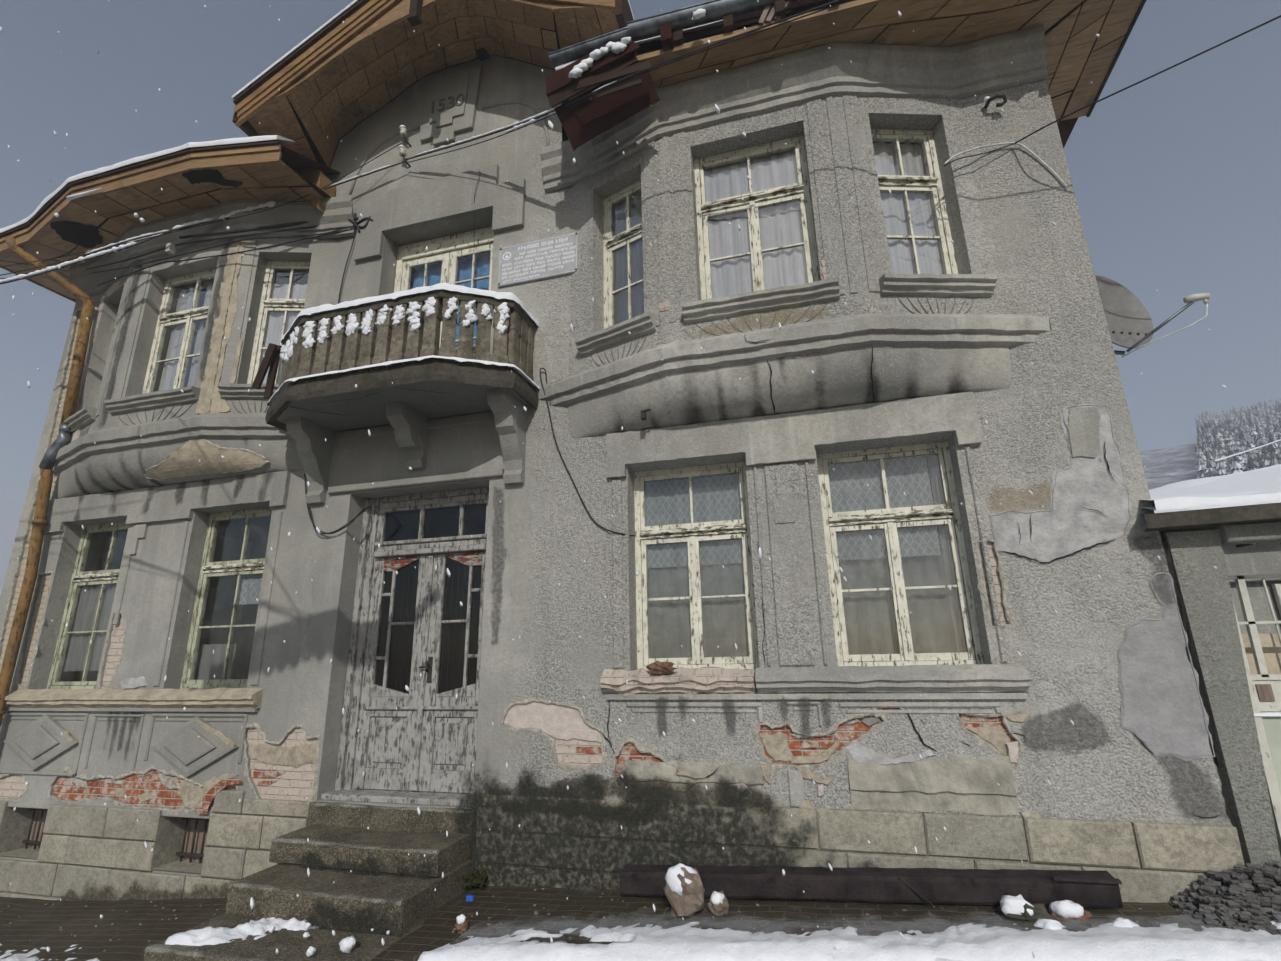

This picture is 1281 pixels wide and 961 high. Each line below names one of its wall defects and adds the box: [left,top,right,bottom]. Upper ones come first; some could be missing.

crack [744,335,775,415]
crack [868,344,876,400]
spalling [47,720,321,815]
spalling [501,697,712,792]
damp [657,699,686,733]
damp [724,700,735,730]
damp [781,698,830,738]
spalling [753,701,935,809]
spalling [956,708,1030,768]
damp [1024,705,1106,750]
damp [455,769,813,890]